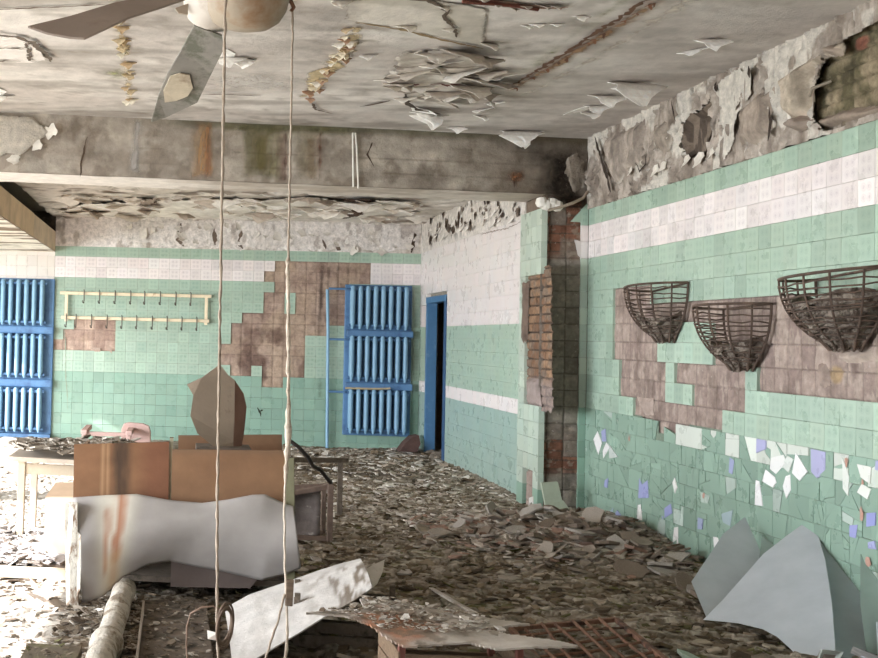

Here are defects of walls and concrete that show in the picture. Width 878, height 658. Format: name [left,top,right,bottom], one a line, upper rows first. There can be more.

peeling [0,115,58,164]
peeling [331,0,592,134]
peeling [650,161,667,177]
peeling [676,39,734,56]
peeling [681,67,752,168]
flaking render [817,21,878,131]
peeling [53,195,519,388]
peeling [521,198,588,509]
peeling [610,285,878,434]